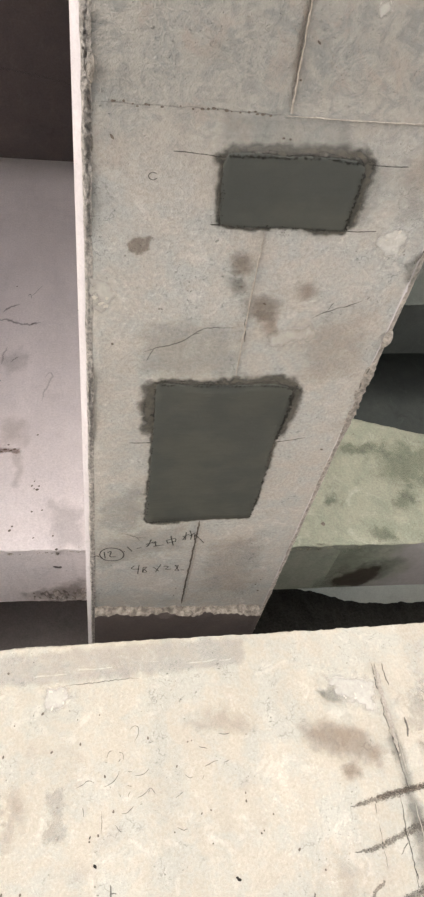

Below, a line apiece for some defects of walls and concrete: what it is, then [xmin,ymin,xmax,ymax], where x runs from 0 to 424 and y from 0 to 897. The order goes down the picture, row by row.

peeling [377,230,407,256]
spalling [388,251,424,331]
spalling [255,346,384,621]
crack [375,802,420,891]